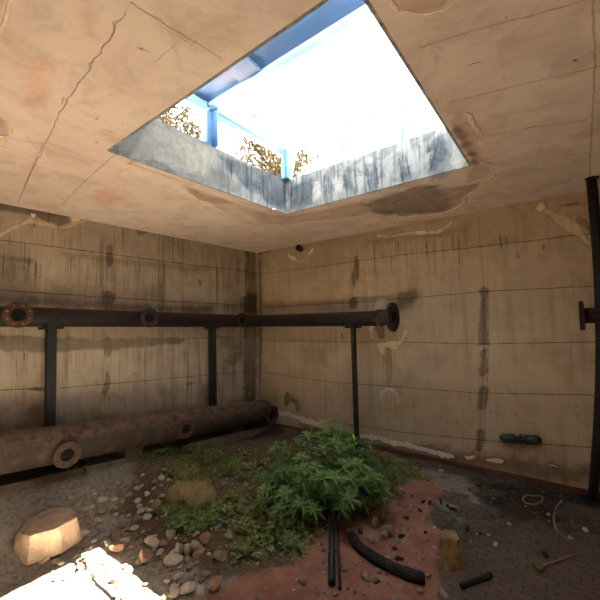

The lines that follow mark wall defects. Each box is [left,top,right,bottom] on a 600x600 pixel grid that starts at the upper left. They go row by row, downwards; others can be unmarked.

peeling [451,155,465,169]
peeling [0,213,86,237]
peeling [536,203,591,245]
water stain [0,336,45,352]
water stain [57,337,184,351]
efflorescence [353,434,454,458]